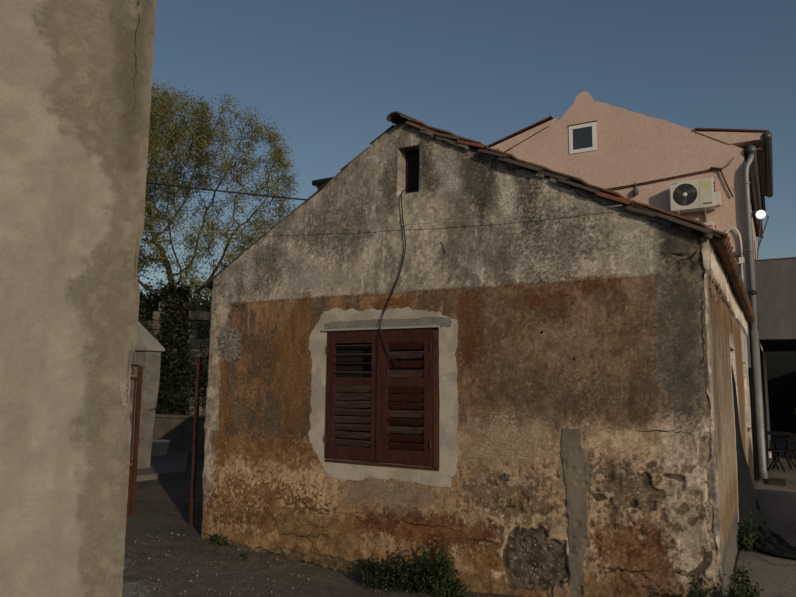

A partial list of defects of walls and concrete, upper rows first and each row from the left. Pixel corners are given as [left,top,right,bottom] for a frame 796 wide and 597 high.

crack [132,0,140,118]
leakage [367,130,401,215]
leakage [37,0,157,597]
leakage [235,197,370,302]
leakage [418,134,721,476]
spalling [444,461,572,597]
flaking render [584,446,685,536]
spalling [698,432,718,552]
leakage [723,511,739,596]